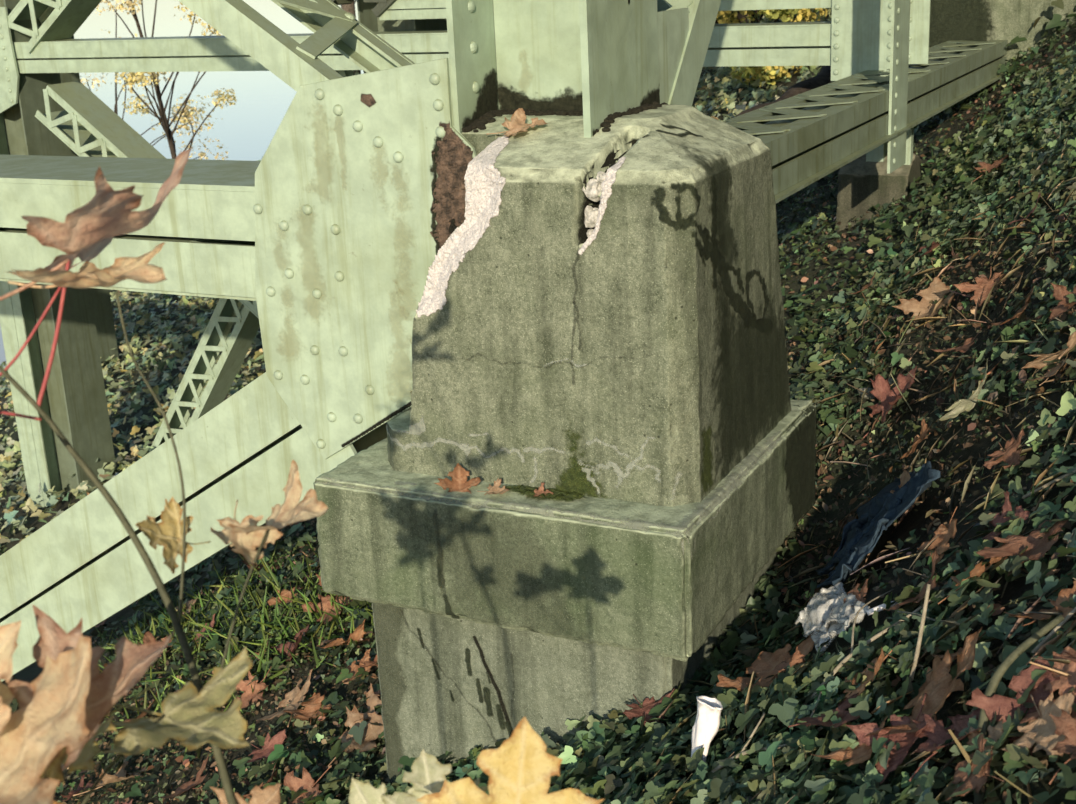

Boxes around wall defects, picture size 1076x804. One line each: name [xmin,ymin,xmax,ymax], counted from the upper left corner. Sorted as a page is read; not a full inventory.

corrosion [360,94,376,107]
corrosion [430,122,473,255]
spalling [416,135,509,317]